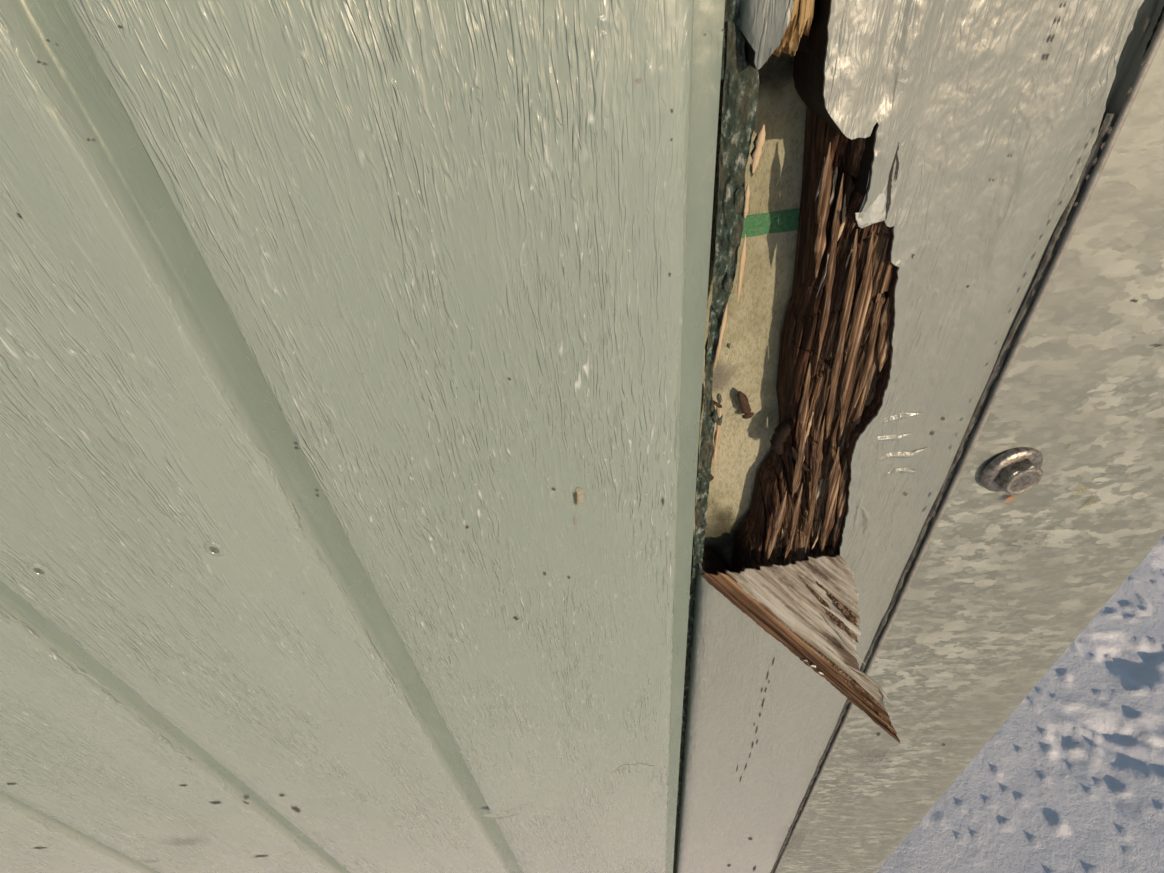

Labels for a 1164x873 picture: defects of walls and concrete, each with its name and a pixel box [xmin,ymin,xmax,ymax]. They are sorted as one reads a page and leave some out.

peeling [692,20,766,579]
peeling [855,170,886,225]